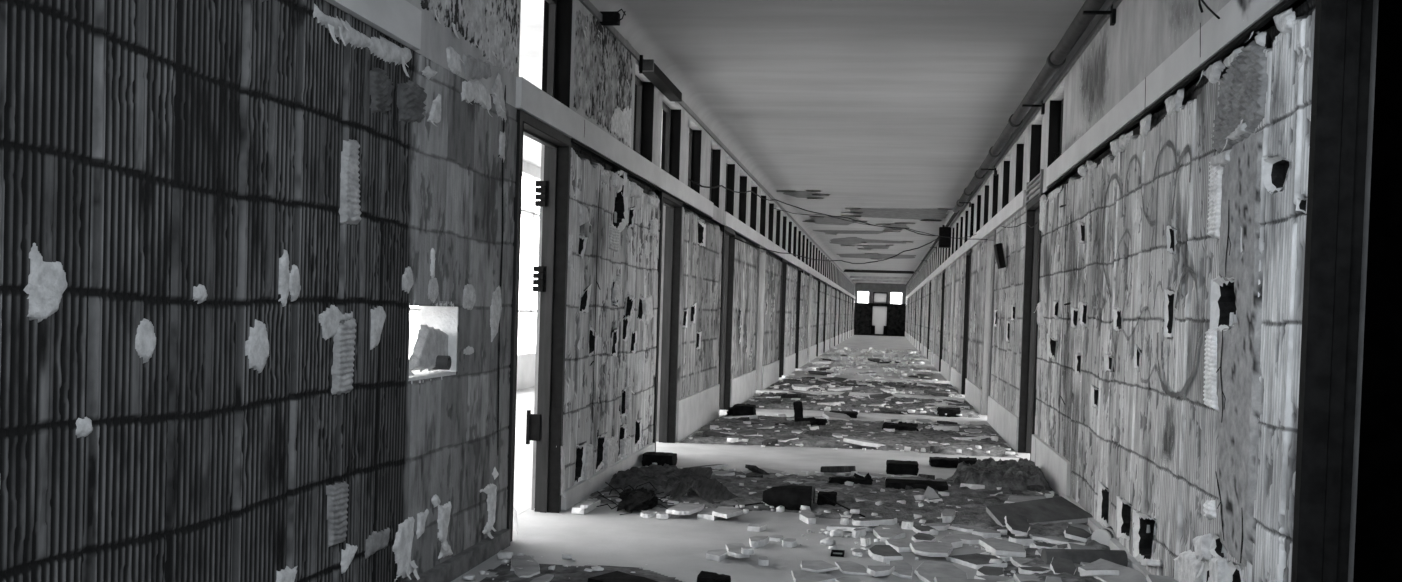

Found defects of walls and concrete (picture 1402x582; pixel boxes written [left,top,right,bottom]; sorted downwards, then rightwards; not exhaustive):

spalling [604,170,644,253]
peeling [776,191,829,199]
peeling [802,208,953,260]
spalling [1207,119,1243,239]
spalling [1263,156,1307,214]
spalling [579,280,645,356]
spalling [1034,300,1088,360]
spalling [1075,352,1099,410]
spalling [1164,288,1175,338]
spalling [1203,275,1238,411]
spalling [562,388,642,498]
spalling [1196,500,1244,582]